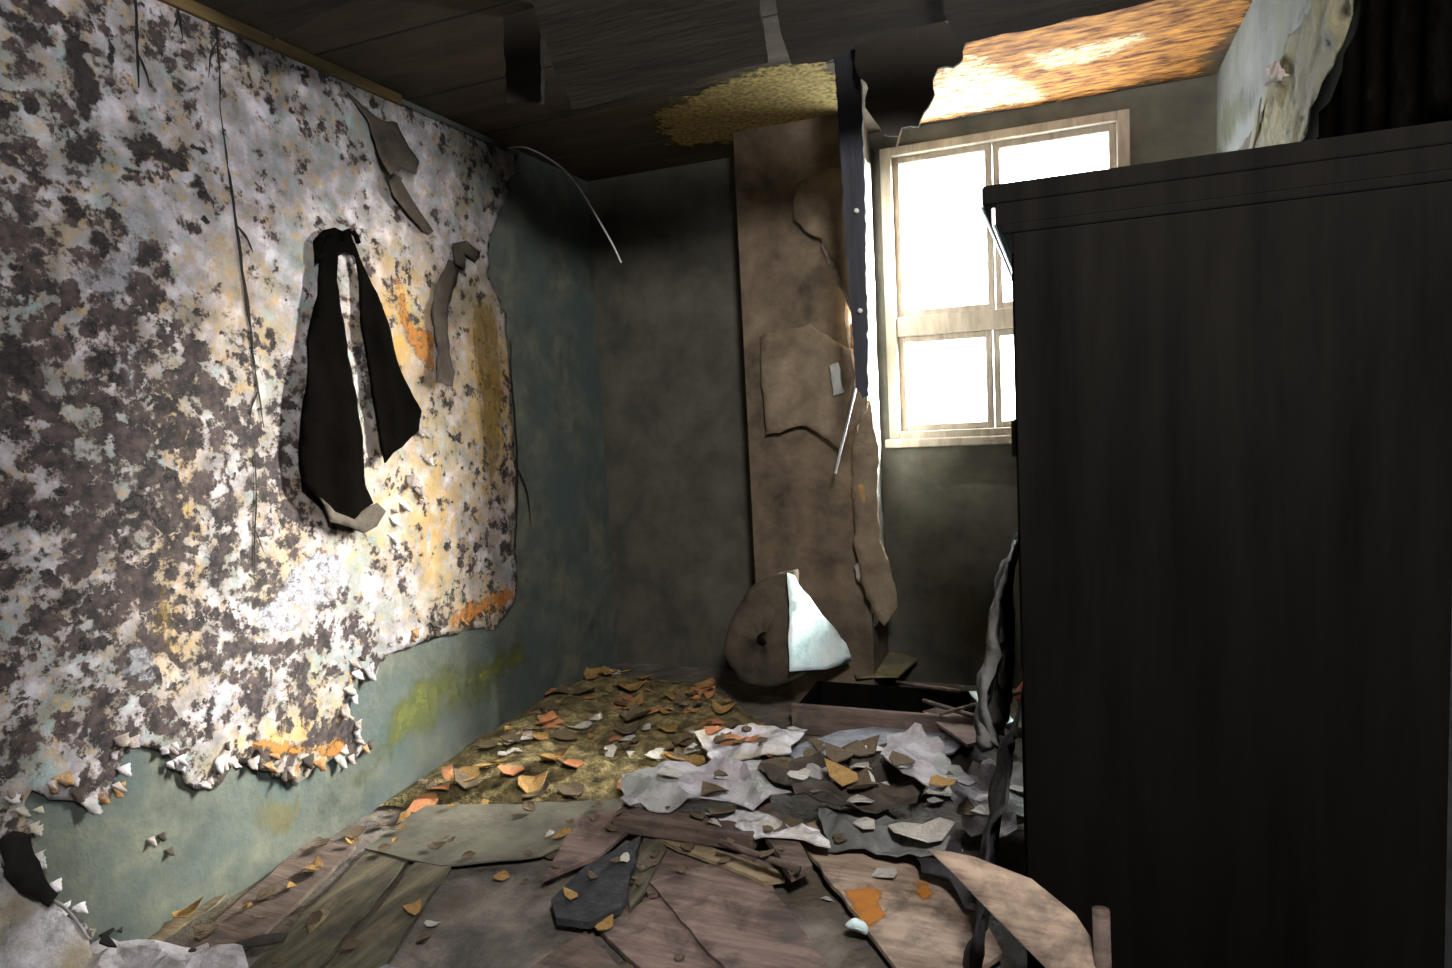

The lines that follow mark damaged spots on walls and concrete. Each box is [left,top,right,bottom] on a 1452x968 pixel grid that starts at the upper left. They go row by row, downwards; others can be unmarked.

damp [0,6,216,224]
damp [249,83,295,115]
peeling [922,55,1047,120]
peeling [1026,33,1145,69]
damp [58,195,130,282]
damp [265,328,278,368]
damp [111,473,176,554]
peeling [387,425,435,543]
damp [0,501,92,621]
peeling [411,621,442,642]
peeling [159,655,377,790]
rust [252,739,347,757]